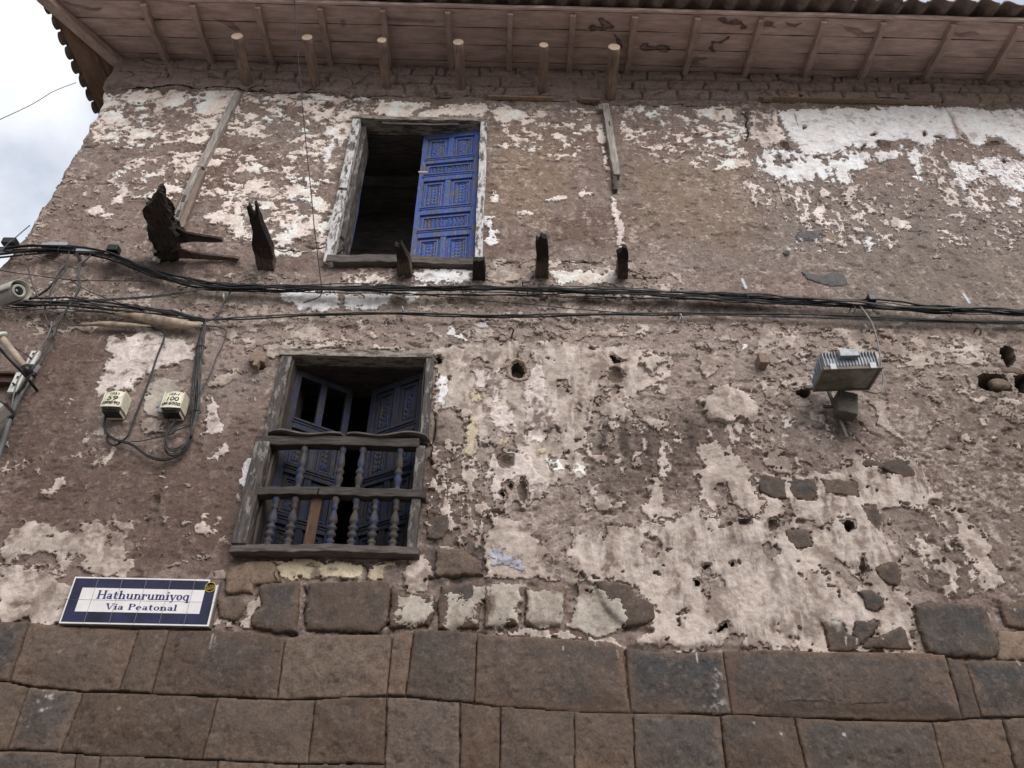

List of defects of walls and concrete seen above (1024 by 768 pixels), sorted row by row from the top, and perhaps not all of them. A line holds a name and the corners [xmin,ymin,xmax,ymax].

peeling [22,88,612,260]
peeling [612,103,1024,260]
peeling [0,190,1024,653]